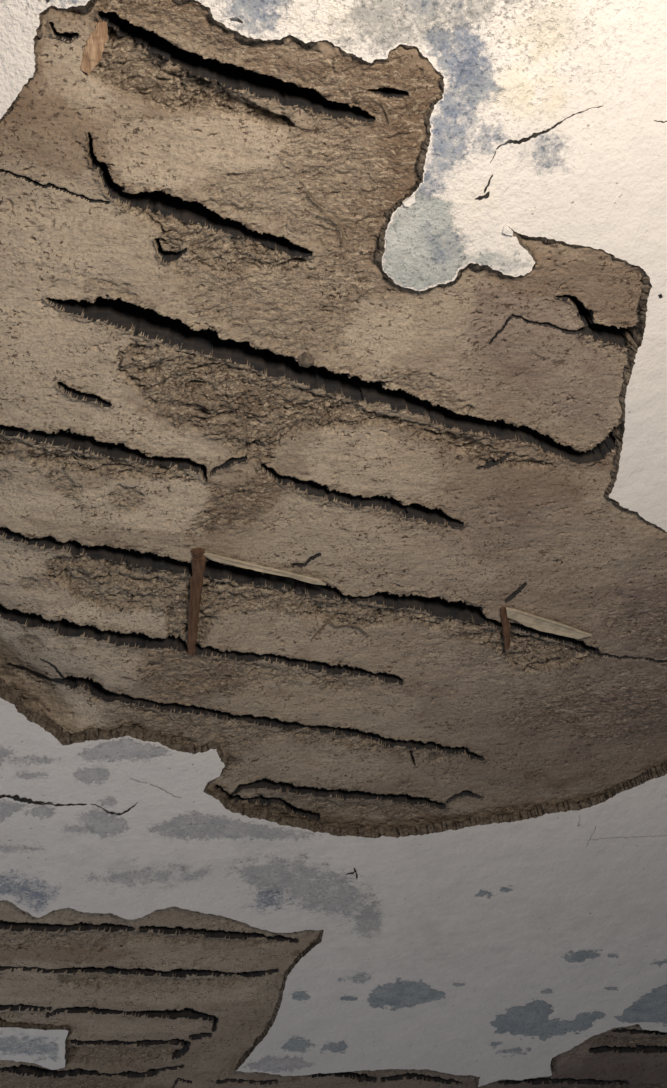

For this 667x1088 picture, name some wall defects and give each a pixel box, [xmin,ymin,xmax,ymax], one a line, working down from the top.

damp [227,0,287,34]
damp [332,0,526,290]
crack [475,106,601,200]
damp [533,136,562,168]
flaking render [0,0,667,838]
damp [0,748,60,779]
damp [74,739,168,785]
crack [0,778,181,816]
damp [149,811,314,841]
damp [0,870,56,911]
damp [234,855,381,938]
flaking render [0,900,667,1088]